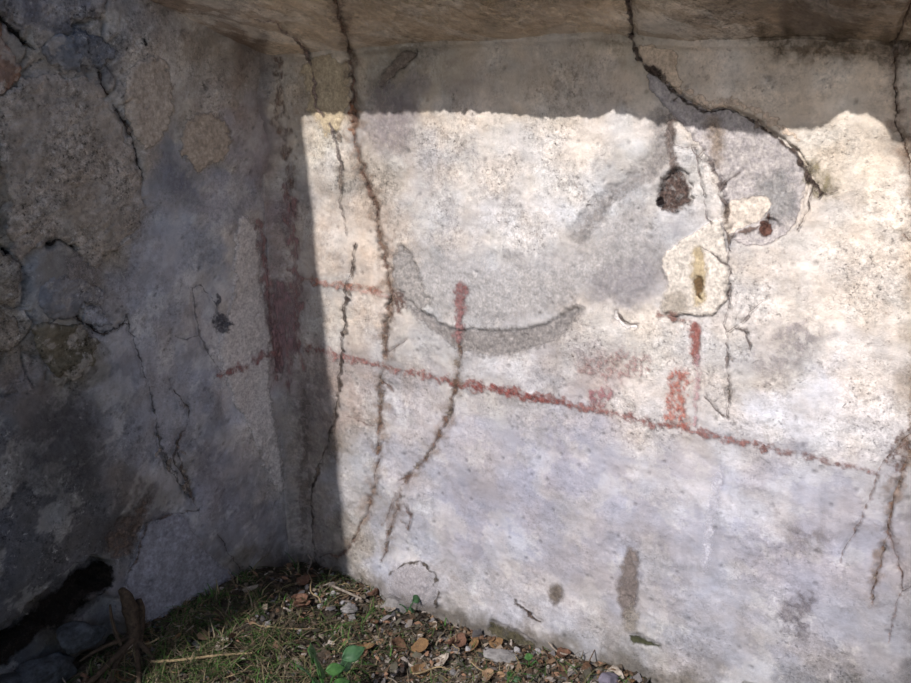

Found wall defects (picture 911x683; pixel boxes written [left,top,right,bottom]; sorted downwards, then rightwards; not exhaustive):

flaking render [124,56,175,148]
flaking render [301,54,351,137]
crack [258,0,462,563]
flaking render [380,50,417,87]
flaking render [391,44,806,357]
crack [625,0,837,419]
crack [891,1,911,175]
crack [841,435,911,640]